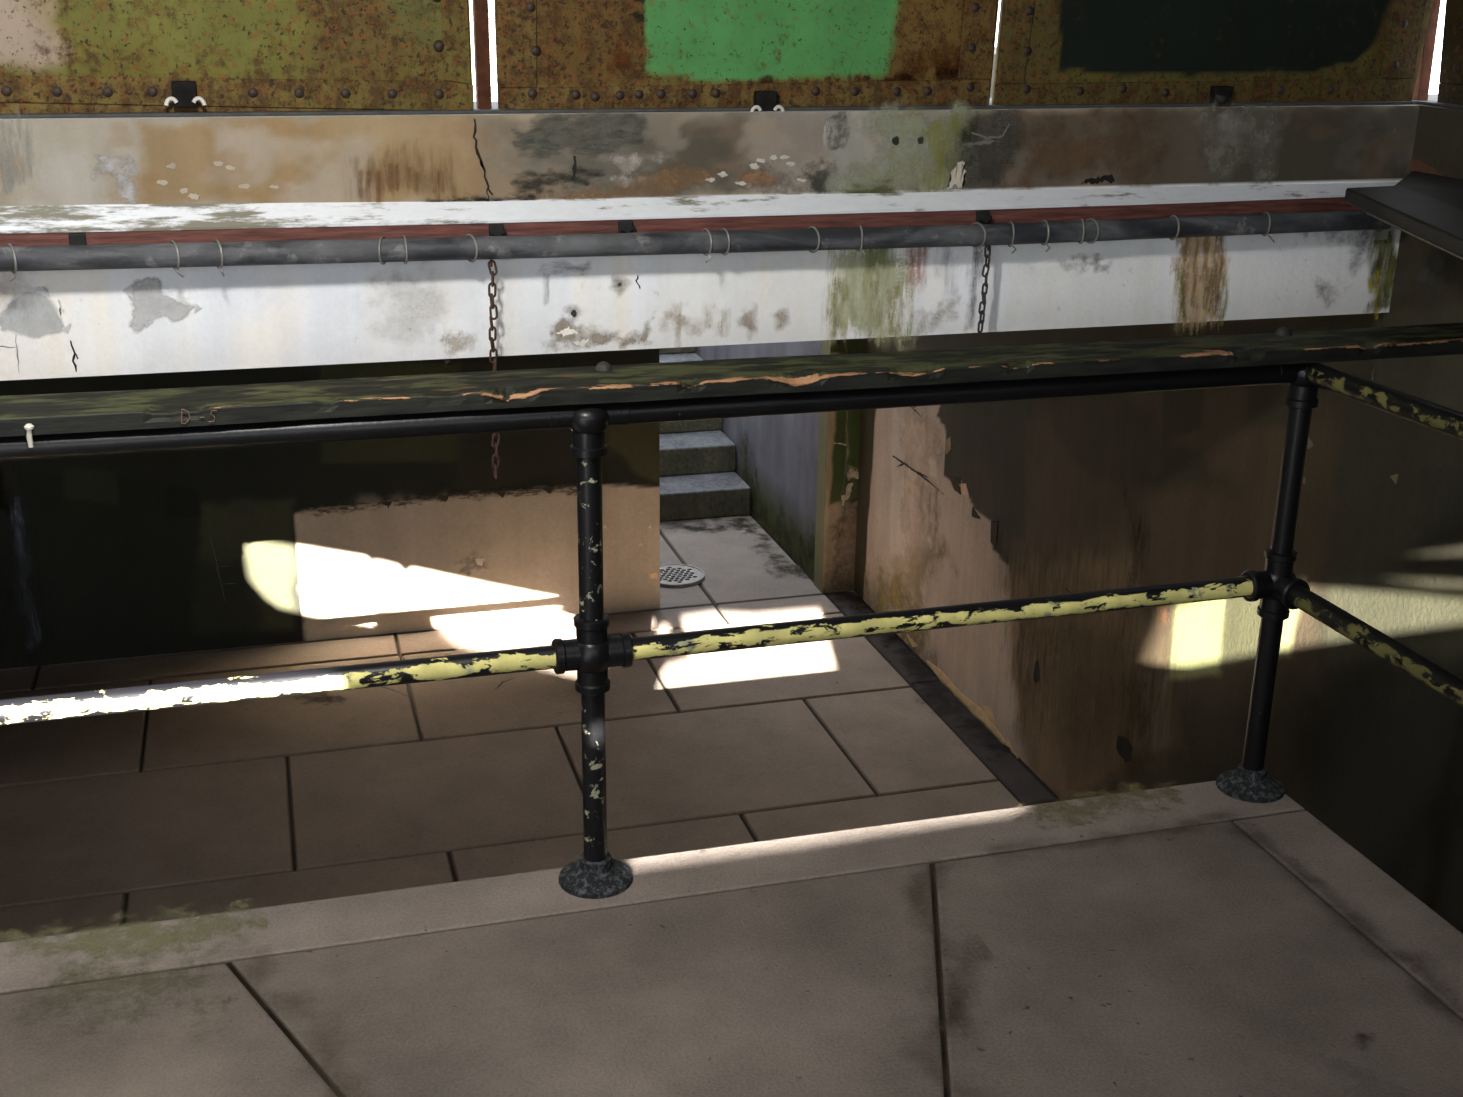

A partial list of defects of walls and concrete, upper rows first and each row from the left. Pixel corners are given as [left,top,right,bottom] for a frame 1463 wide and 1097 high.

crack [473,119,493,202]
leakage [429,110,645,202]
peeling [0,286,71,337]
peeling [122,278,202,331]
peeling [949,476,999,546]